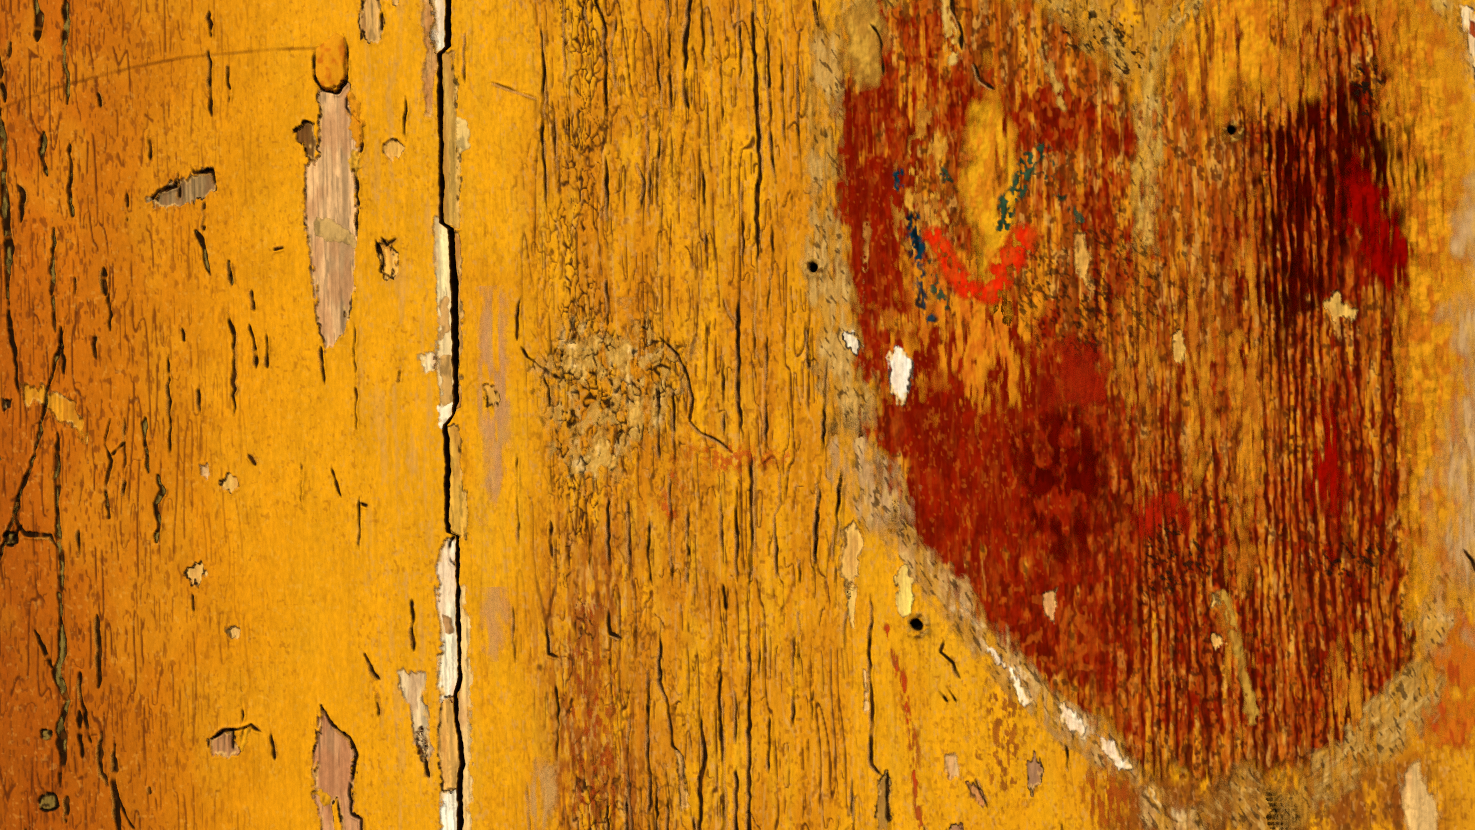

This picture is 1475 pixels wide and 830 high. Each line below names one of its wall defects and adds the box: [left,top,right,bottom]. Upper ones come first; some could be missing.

peeling [146,167,217,209]
peeling [293,81,366,353]
peeling [358,0,399,44]
crack [464,0,617,205]
crack [516,0,842,609]
crack [0,0,276,830]
spalling [398,0,509,830]
peeling [311,705,360,830]
crack [514,628,560,750]
crack [607,612,621,639]
crack [606,639,813,830]
peeling [1401,761,1438,830]